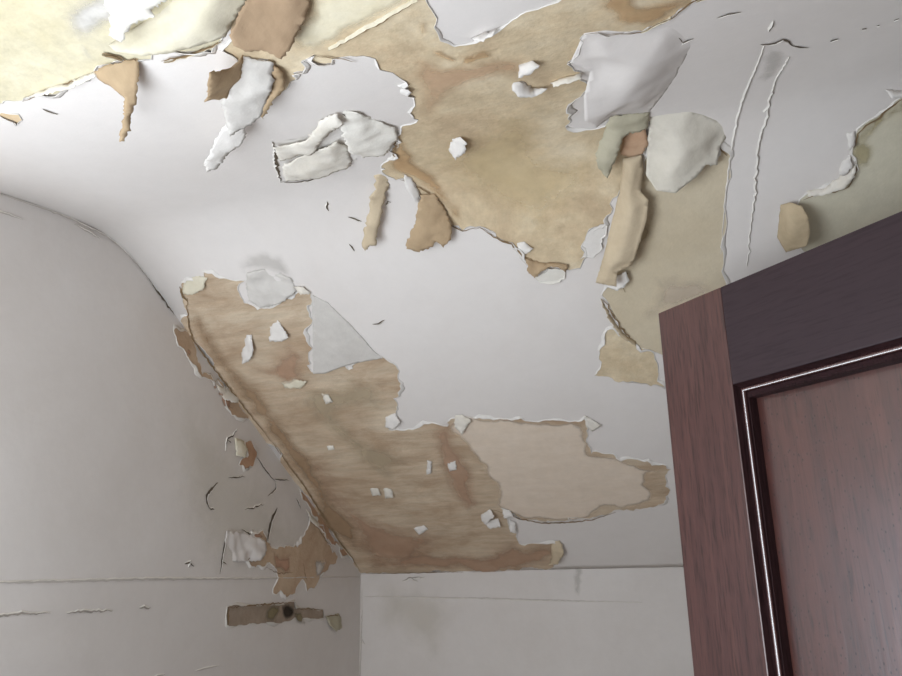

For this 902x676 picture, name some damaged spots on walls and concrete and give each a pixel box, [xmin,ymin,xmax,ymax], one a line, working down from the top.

peeling [0,0,734,389]
crack [720,21,806,266]
peeling [777,90,902,253]
crack [225,429,237,451]
crack [0,456,641,603]
peeling [173,269,671,632]